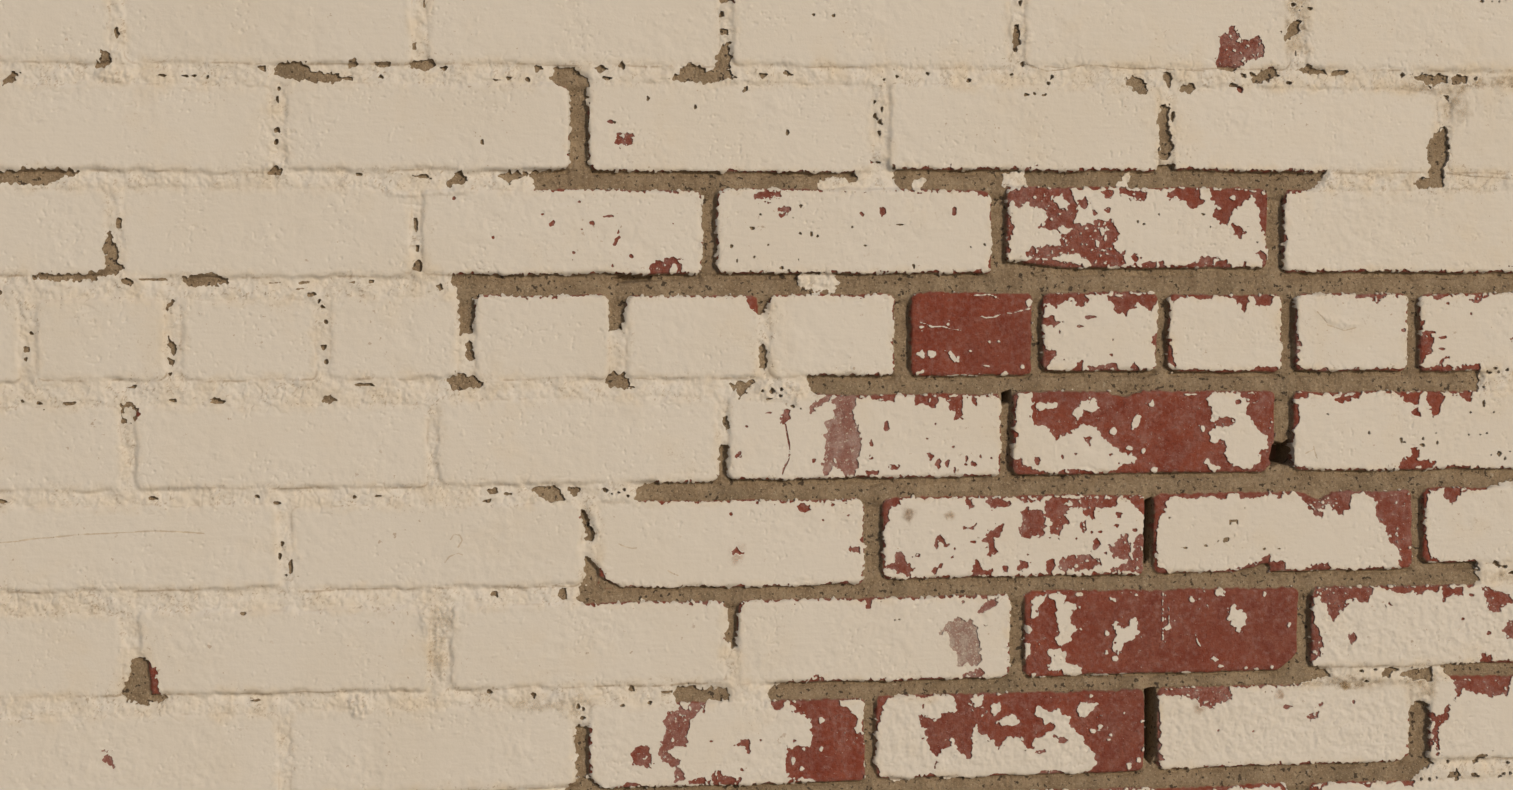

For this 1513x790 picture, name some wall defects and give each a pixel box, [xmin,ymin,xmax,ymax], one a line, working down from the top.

spalling [1280,3,1312,42]
spalling [2,71,21,86]
spalling [258,58,391,103]
spalling [409,42,448,71]
peeling [1215,26,1347,93]
spalling [0,164,80,186]
spalling [412,170,467,200]
spalling [32,217,229,288]
spalling [412,218,422,272]
spalling [167,336,177,376]
peeling [436,61,1513,790]
spalling [122,657,168,706]